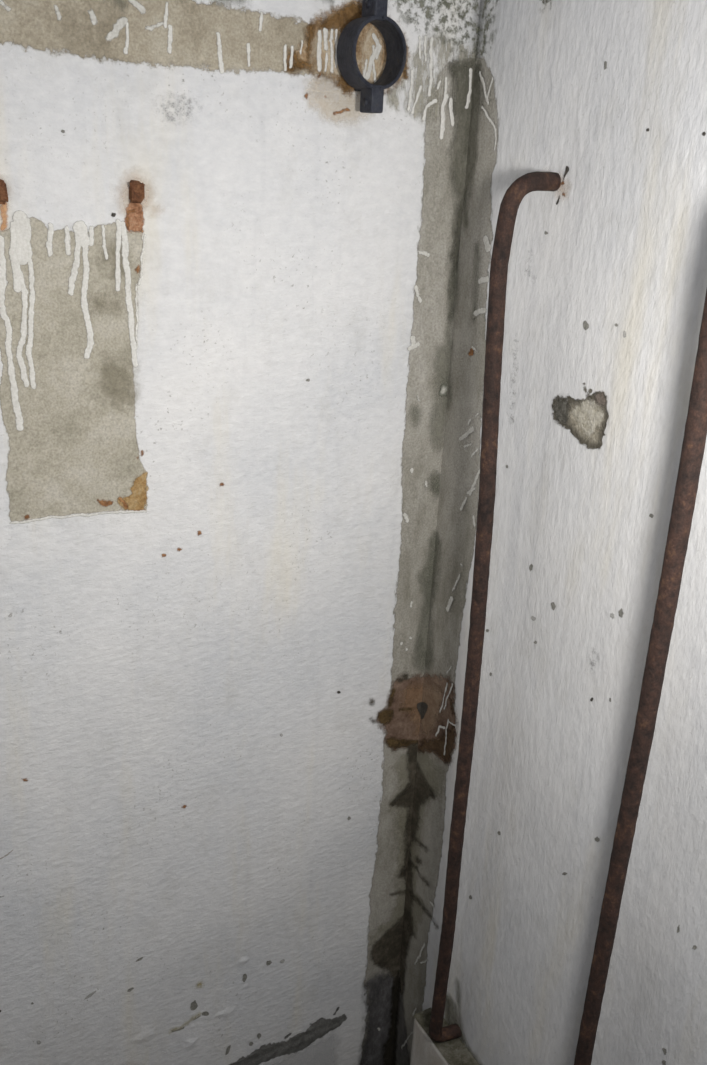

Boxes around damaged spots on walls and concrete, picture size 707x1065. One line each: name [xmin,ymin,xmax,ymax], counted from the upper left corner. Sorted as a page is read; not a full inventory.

peeling [0,0,322,76]
corrosion [286,0,408,121]
corrosion [124,201,145,233]
peeling [0,211,148,524]
peeling [388,35,499,708]
spalling [552,383,609,449]
corrosion [370,666,458,764]
peeling [360,731,479,1065]
spalling [226,1007,347,1065]